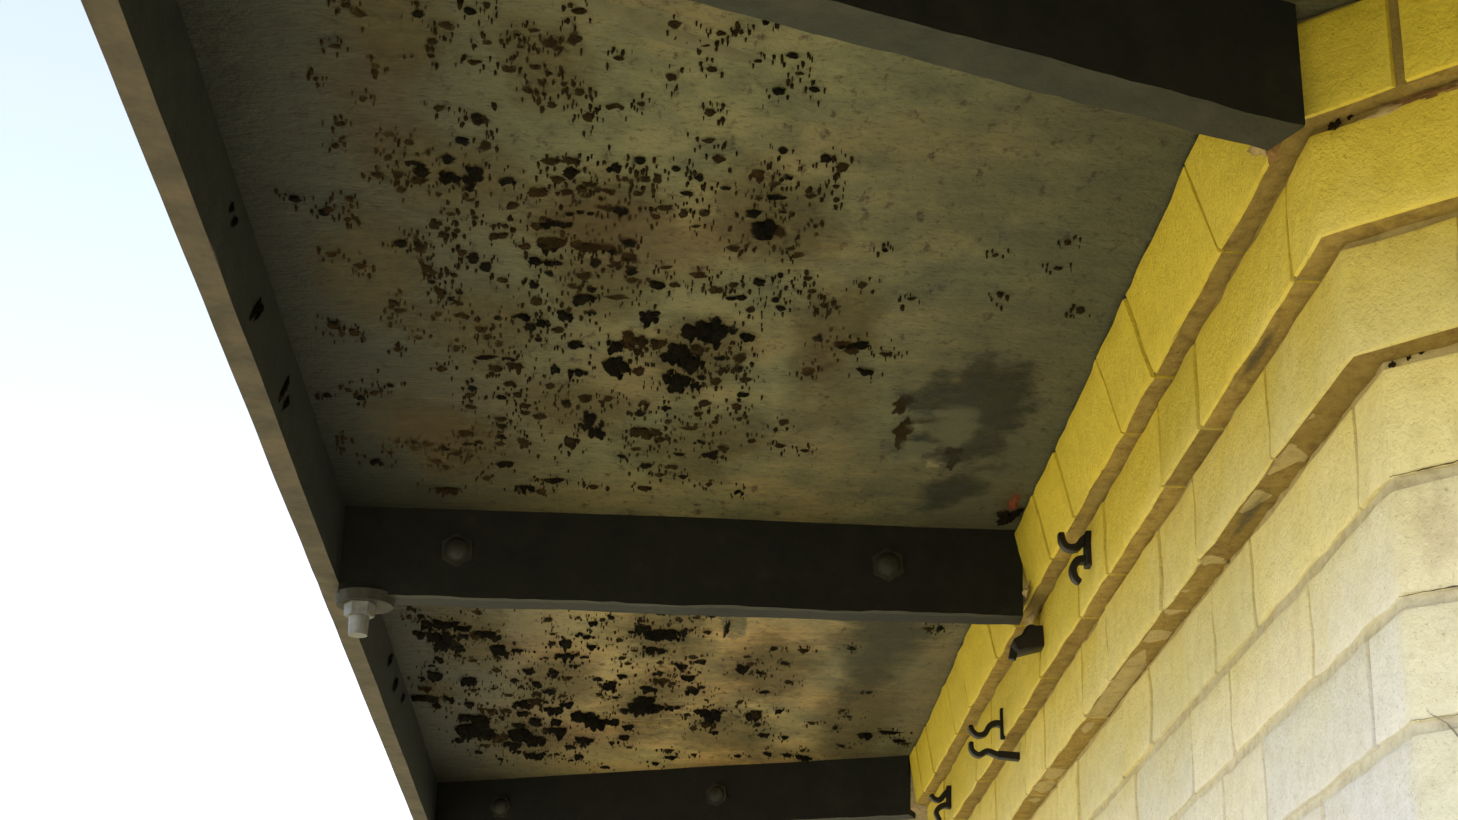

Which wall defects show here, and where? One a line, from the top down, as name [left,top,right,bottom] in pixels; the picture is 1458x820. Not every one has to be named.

peeling [720,617,748,638]